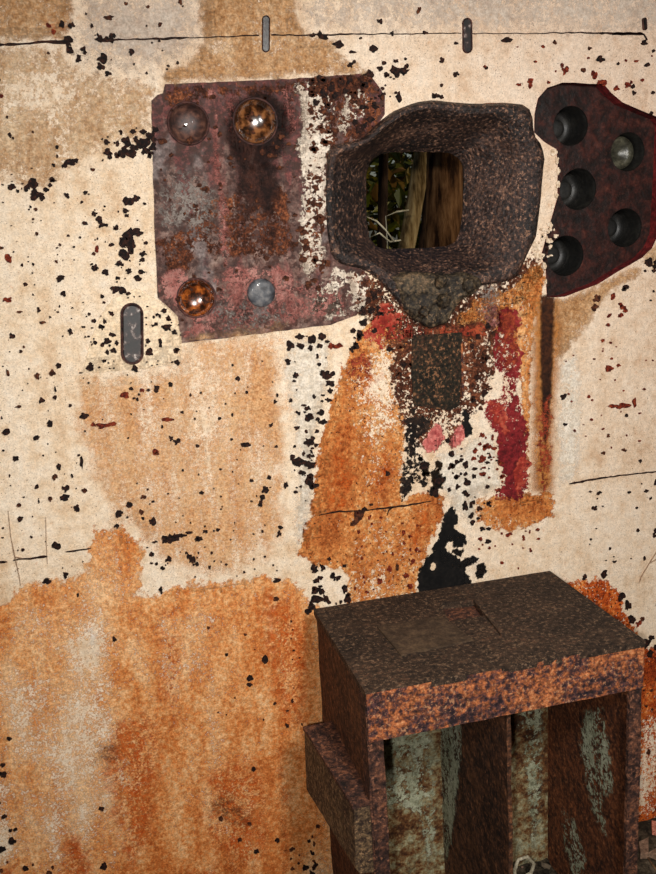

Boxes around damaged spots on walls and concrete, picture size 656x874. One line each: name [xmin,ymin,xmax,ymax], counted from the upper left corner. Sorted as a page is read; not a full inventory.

crack [0,39,73,47]
crack [95,32,648,42]
peeling [1,145,79,236]
corrosion [155,72,383,278]
peeling [46,0,656,615]
peeling [22,363,61,427]
corrosion [298,251,559,603]
peeling [33,435,87,512]
crack [319,501,431,516]
crack [570,471,656,484]
corrosion [566,575,638,635]
corrosion [0,525,333,874]